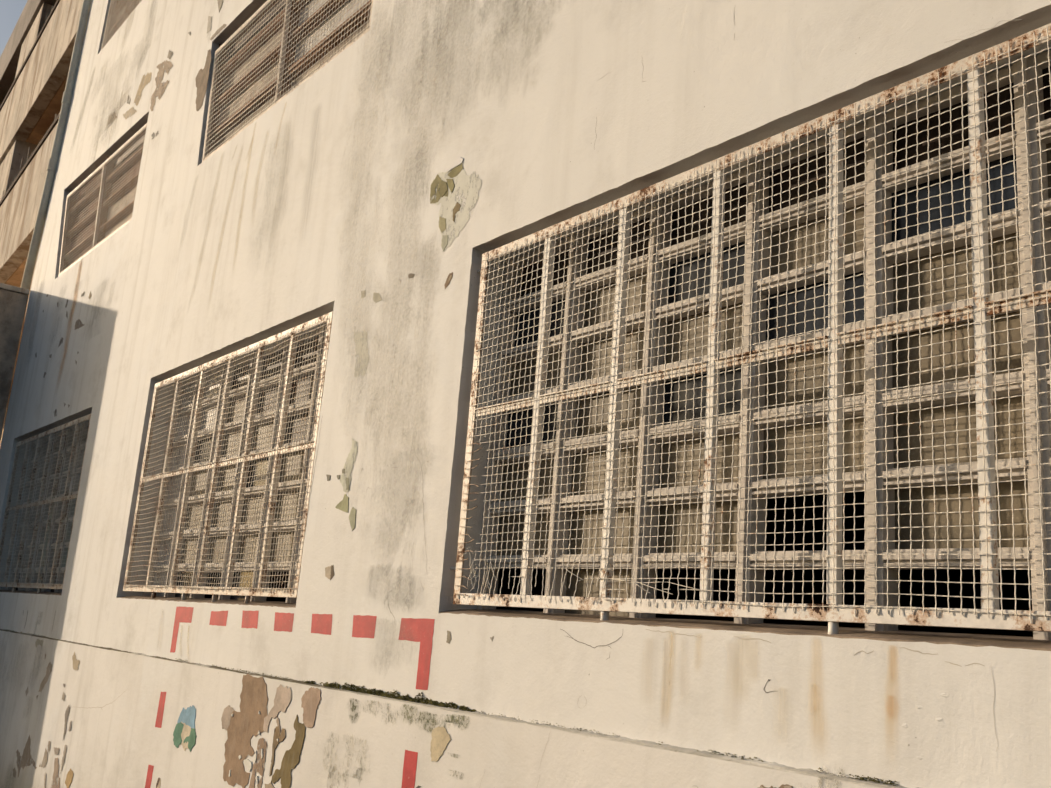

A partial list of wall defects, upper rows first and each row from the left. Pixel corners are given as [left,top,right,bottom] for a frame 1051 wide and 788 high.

peeling [107,49,173,125]
peeling [195,0,227,111]
peeling [430,157,481,252]
peeling [354,331,369,377]
peeling [326,439,358,531]
peeling [25,639,52,699]
peeling [13,684,74,788]
peeling [173,705,197,752]
peeling [221,674,321,788]
peeling [430,726,451,762]